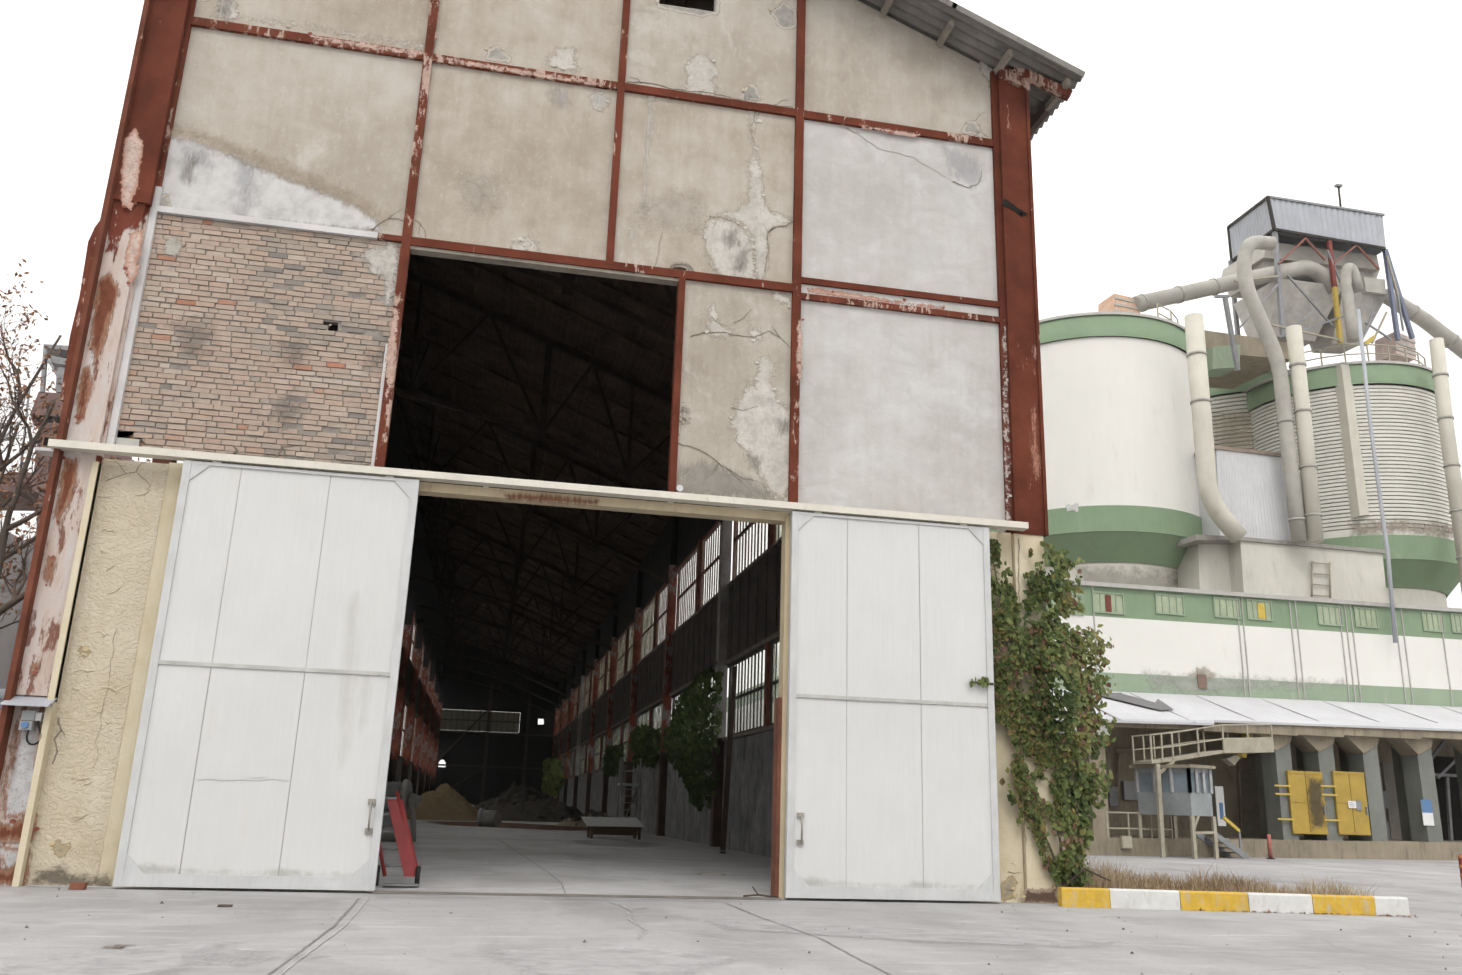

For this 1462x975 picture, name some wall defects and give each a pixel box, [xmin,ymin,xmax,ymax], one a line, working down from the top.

peeling [120,128,144,210]
peeling [859,123,920,137]
crack [837,125,982,188]
peeling [123,229,144,287]
flaking render [701,100,805,385]
peeling [807,288,945,310]
rust [74,273,121,424]
flaking render [678,403,687,443]
flaking render [705,303,790,501]
rust [54,456,79,525]
rust [43,555,56,587]
rust [0,813,40,886]